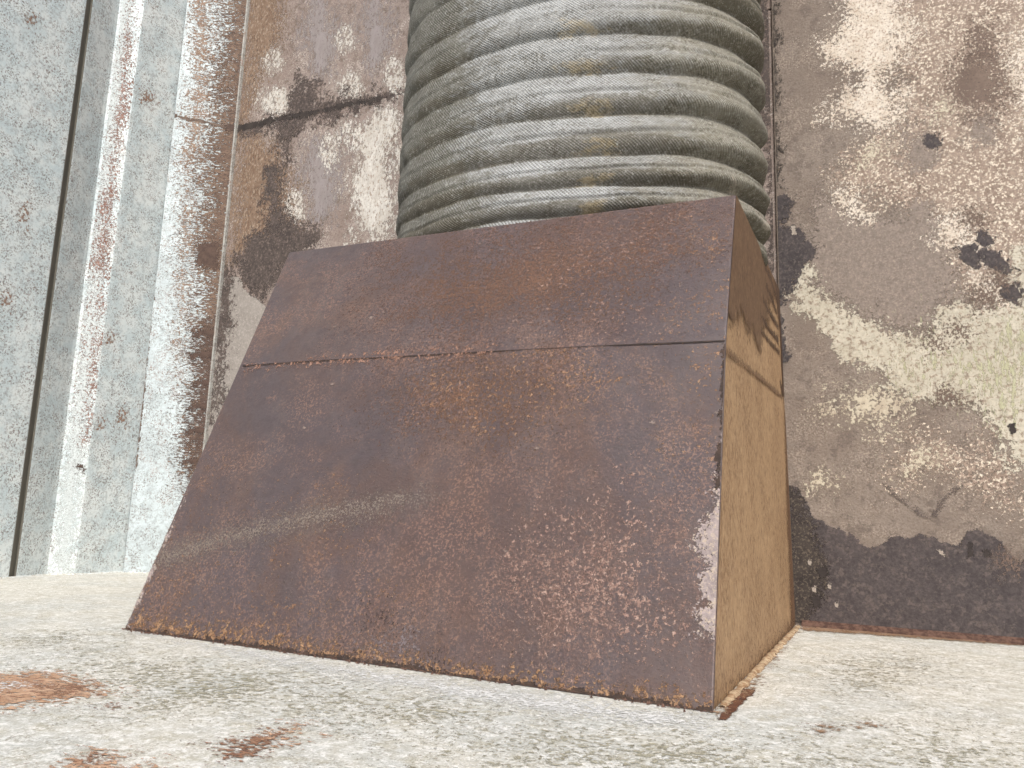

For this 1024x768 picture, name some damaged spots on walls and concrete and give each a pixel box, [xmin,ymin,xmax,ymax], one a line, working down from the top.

crack [174,114,235,133]
leakage [230,0,402,305]
rust [811,0,1024,313]
rust [156,0,314,557]
rust [124,200,1024,717]
leakage [789,483,1024,638]
rust [0,668,139,714]
rust [201,719,333,766]
rust [801,721,889,735]